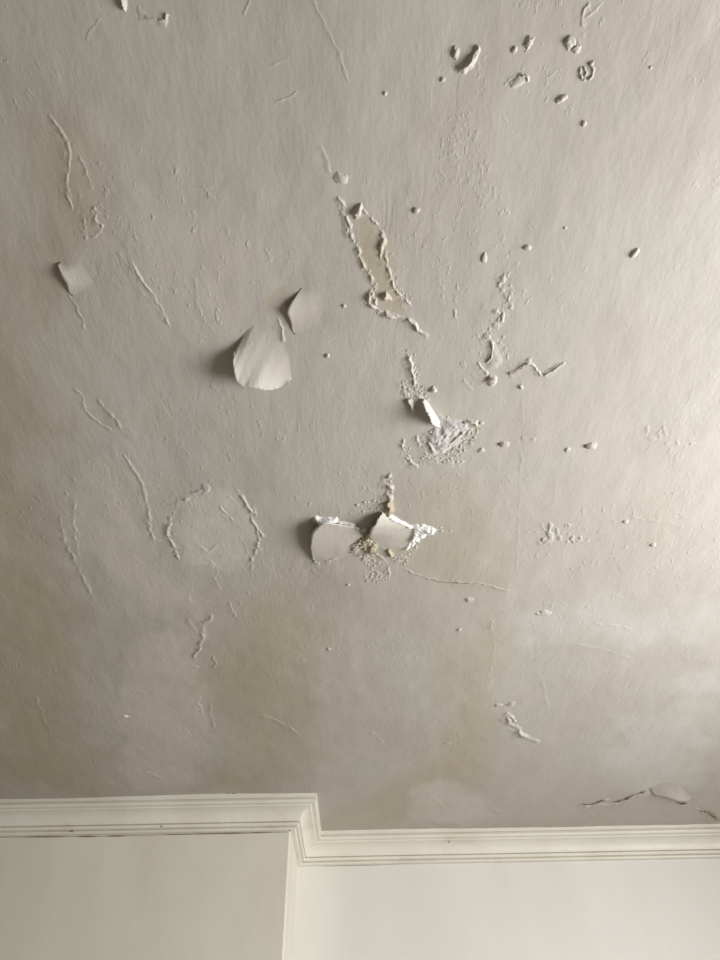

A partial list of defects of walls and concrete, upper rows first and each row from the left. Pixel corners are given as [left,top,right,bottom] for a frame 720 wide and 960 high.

peeling [58,262,91,331]
peeling [233,288,326,391]
peeling [332,171,430,340]
spalling [396,349,485,472]
spalling [304,469,452,583]
peeling [494,701,542,747]
crack [576,791,653,810]
crack [687,806,718,823]